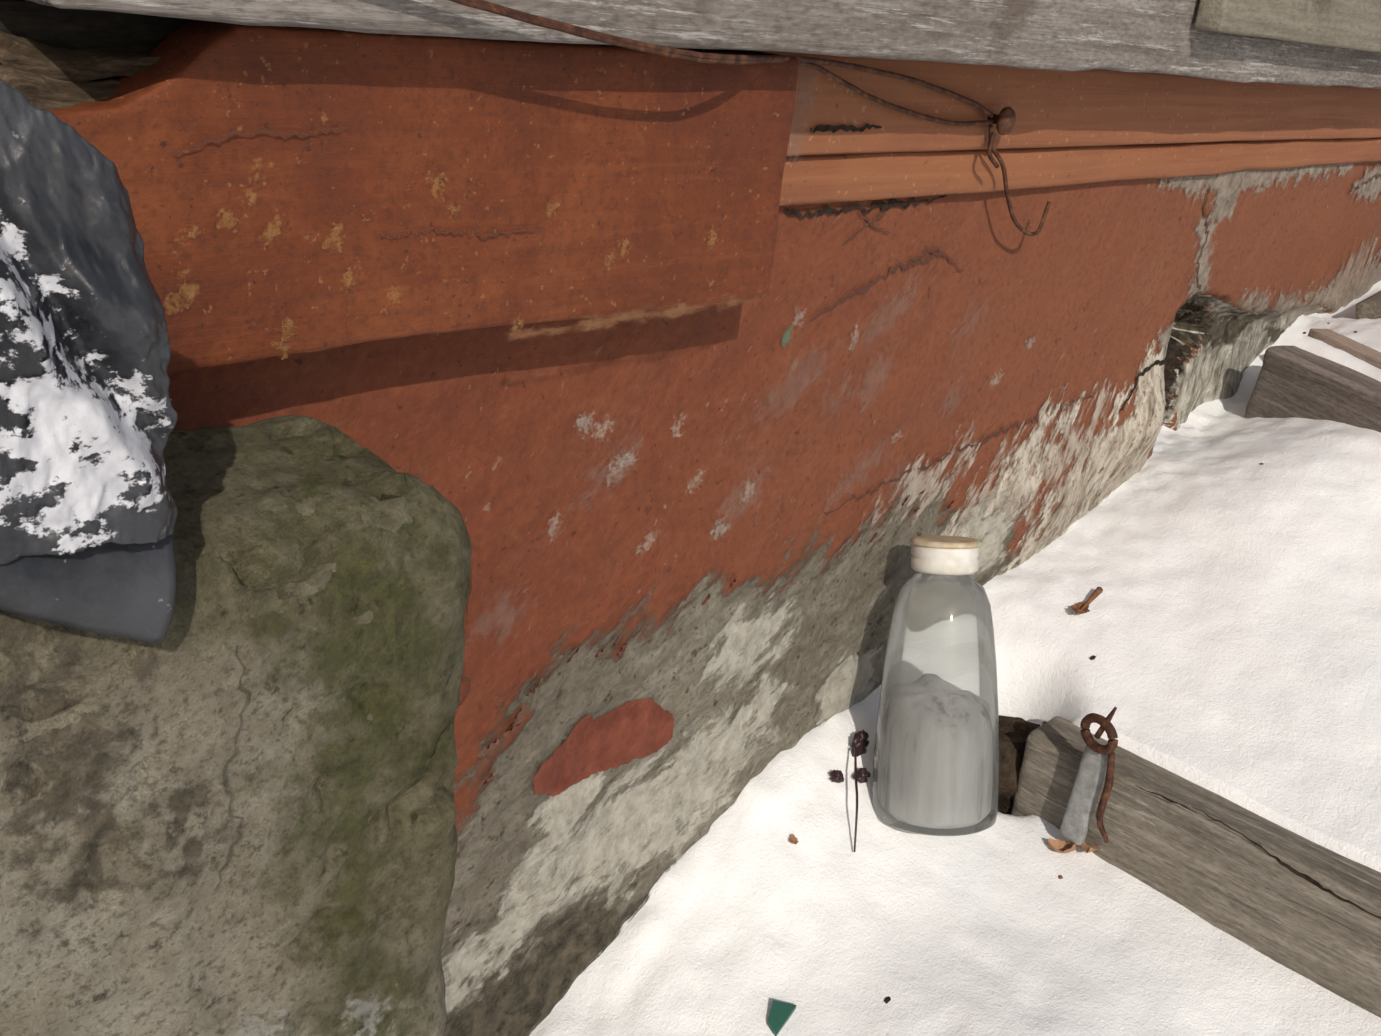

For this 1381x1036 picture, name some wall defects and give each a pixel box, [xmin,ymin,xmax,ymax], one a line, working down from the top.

peeling [1159,163,1381,201]
spalling [1159,241,1381,431]
peeling [441,472,1025,1024]